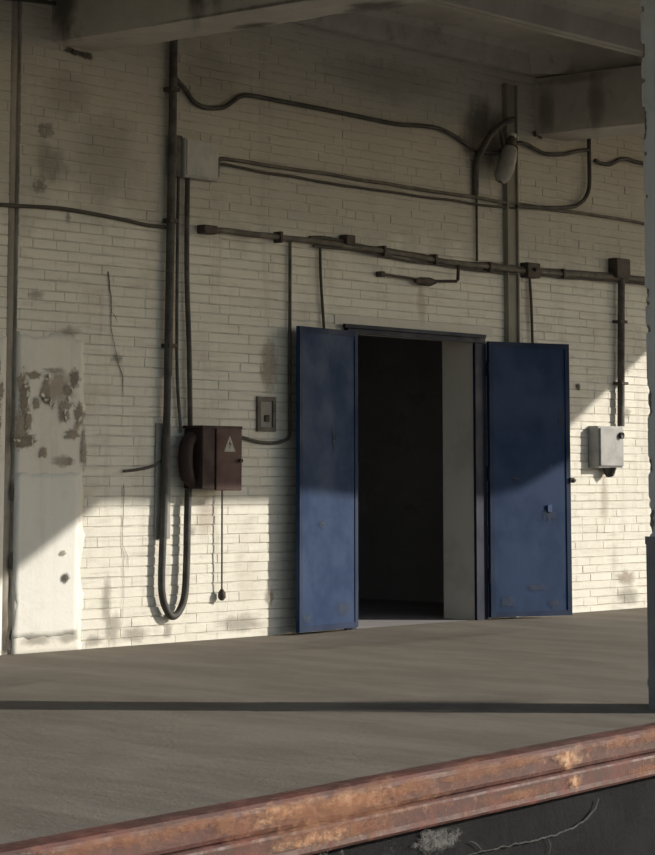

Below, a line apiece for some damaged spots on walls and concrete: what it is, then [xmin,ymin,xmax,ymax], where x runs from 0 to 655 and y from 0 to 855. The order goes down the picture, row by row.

crack [107,271,123,393]
flaking render [13,369,87,470]
corrosion [556,751,581,786]
corrosion [279,827,347,848]
corrosion [254,787,402,828]
crack [469,798,599,855]